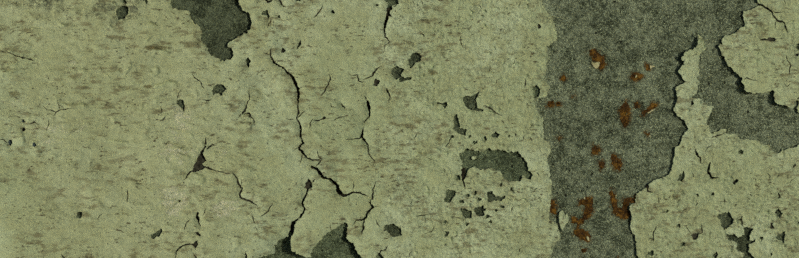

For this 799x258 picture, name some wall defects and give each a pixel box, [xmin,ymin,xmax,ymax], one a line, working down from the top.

peeling [170,0,252,61]
crack [238,94,255,123]
crack [265,8,449,248]
corrosion [618,102,657,128]
peeling [532,0,799,258]
crack [175,209,206,258]
crack [183,138,273,231]
peeling [242,203,402,258]
peeling [444,114,532,226]
corrosion [571,196,594,253]
corrosion [591,146,622,171]
corrosion [609,190,638,219]